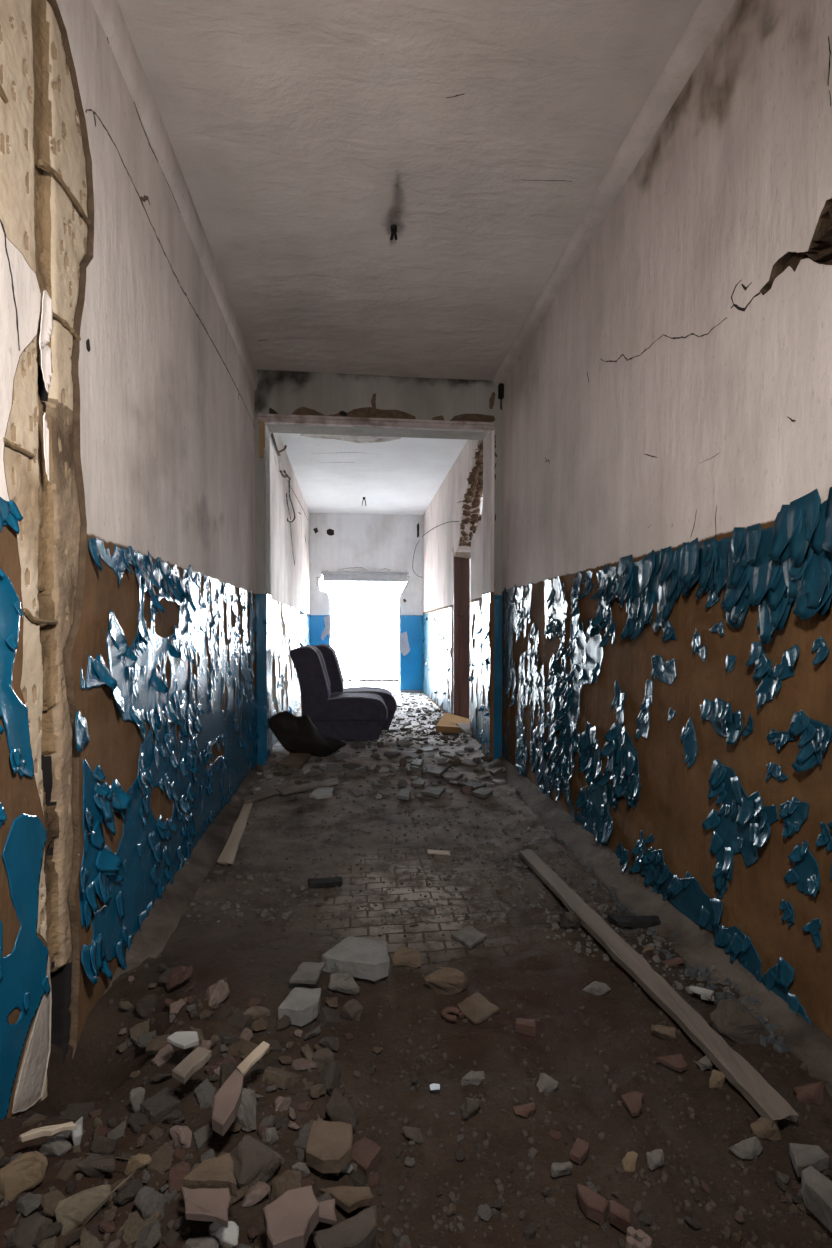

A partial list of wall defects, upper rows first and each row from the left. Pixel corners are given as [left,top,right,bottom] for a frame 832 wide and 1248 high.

spalling [760,198,832,295]
crack [587,280,760,381]
spalling [457,440,483,547]
spalling [0,0,329,1119]
peeling [401,599,452,714]
peeling [467,487,832,1026]